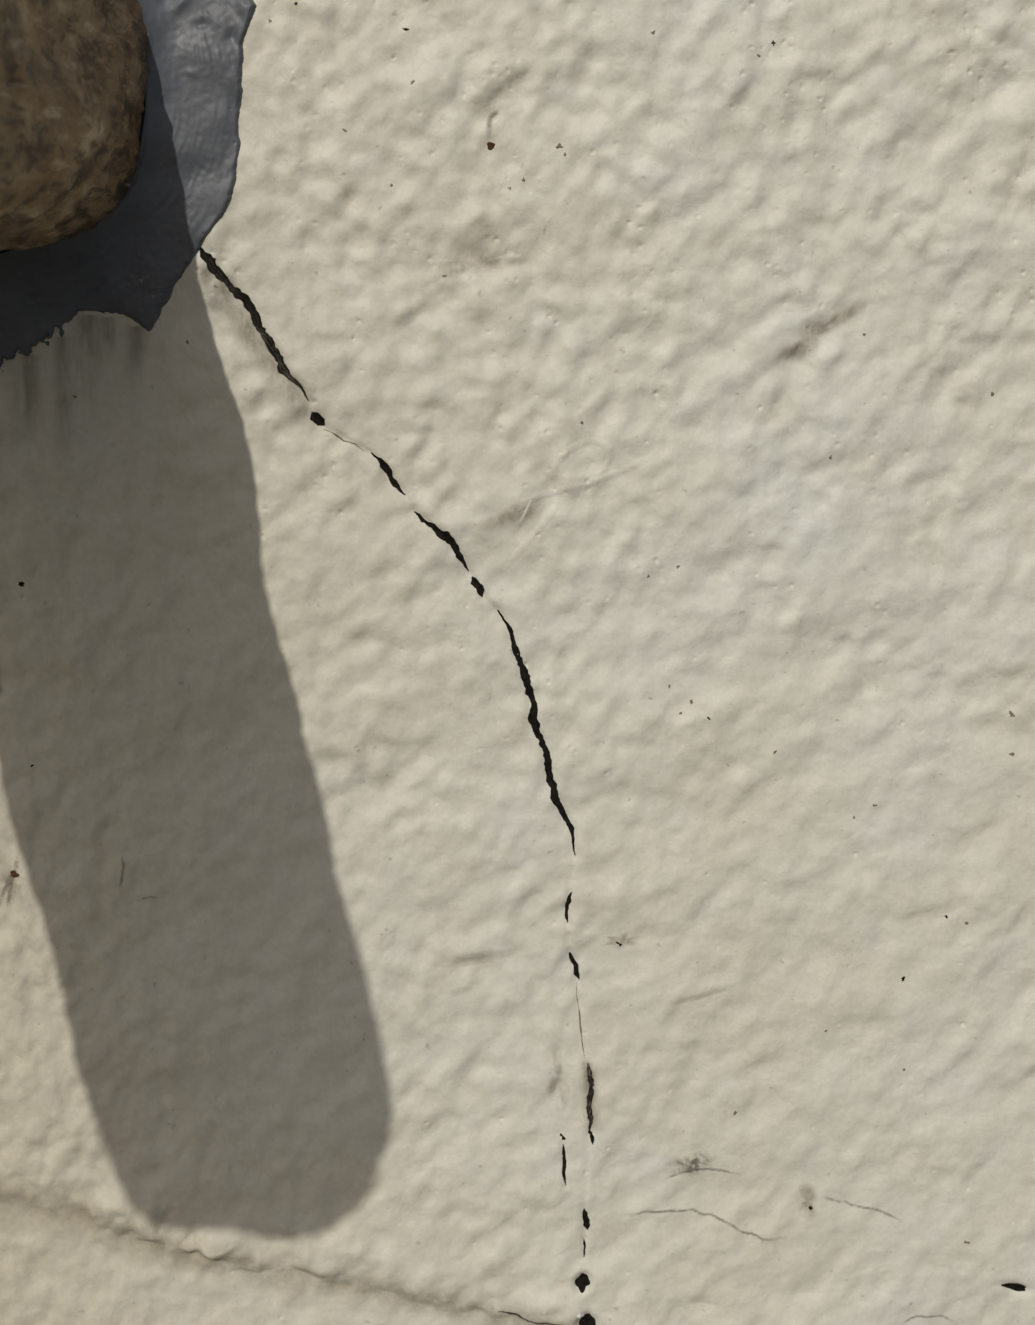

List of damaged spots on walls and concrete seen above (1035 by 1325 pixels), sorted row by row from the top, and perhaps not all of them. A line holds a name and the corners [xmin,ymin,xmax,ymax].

crack [200,247,576,855]
crack [560,892,594,1257]
crack [498,1311,555,1325]